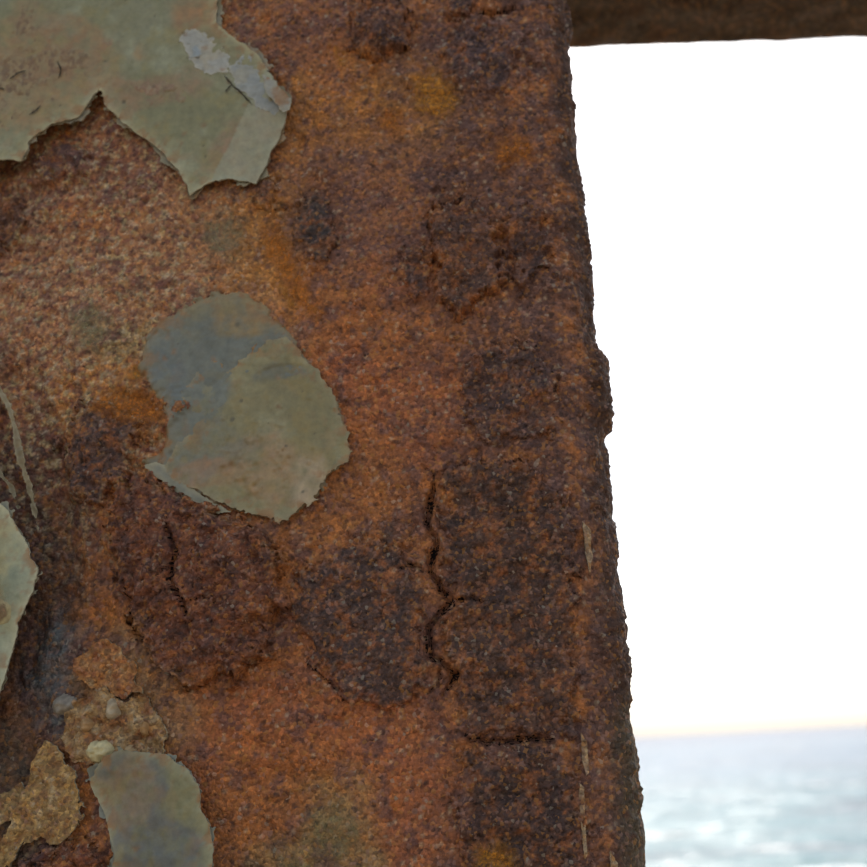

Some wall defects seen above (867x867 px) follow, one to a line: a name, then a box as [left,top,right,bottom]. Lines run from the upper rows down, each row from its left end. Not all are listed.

peeling [0,0,292,200]
rust [418,0,522,115]
peeling [138,291,352,524]
peeling [0,386,43,692]
rust [52,339,603,867]
crack [398,468,484,710]
peeling [0,638,216,867]